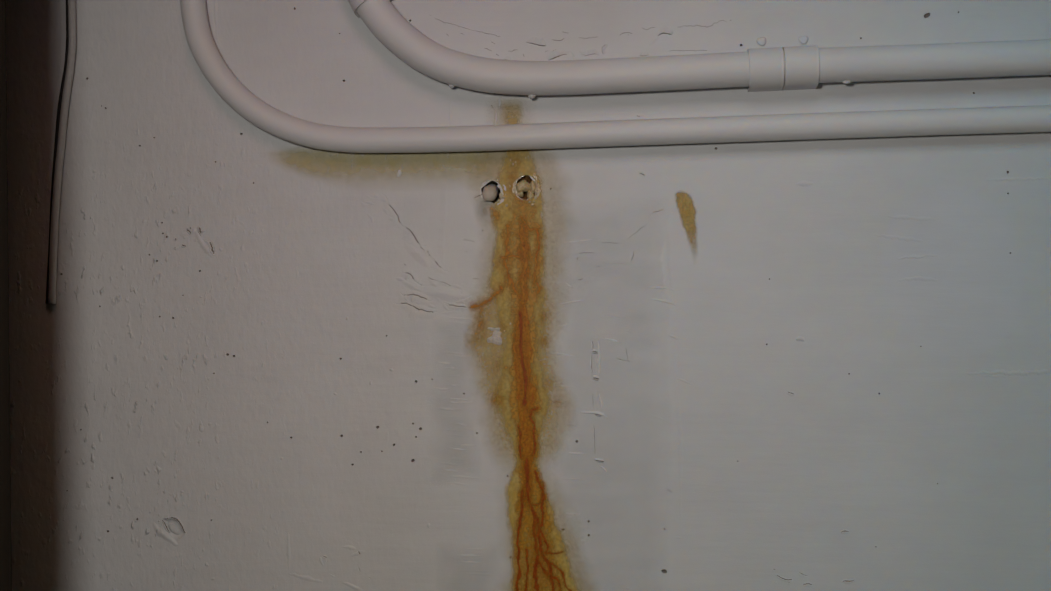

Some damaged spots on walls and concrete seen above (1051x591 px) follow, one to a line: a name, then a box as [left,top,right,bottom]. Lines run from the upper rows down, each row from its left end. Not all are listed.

rust [470,150,577,591]
rust [676,192,696,244]